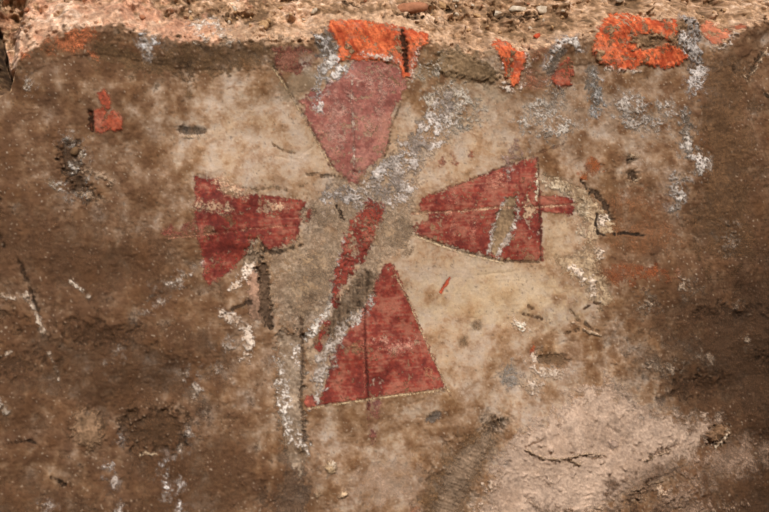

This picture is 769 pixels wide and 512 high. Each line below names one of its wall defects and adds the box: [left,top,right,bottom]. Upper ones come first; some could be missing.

water stain [314,30,348,112]
flaking render [327,19,429,81]
water stain [420,81,481,131]
flaking render [492,38,530,92]
water stain [520,37,584,138]
flaking render [592,12,690,73]
flaking render [701,20,746,49]
water stain [584,15,769,512]
water stain [502,353,562,396]